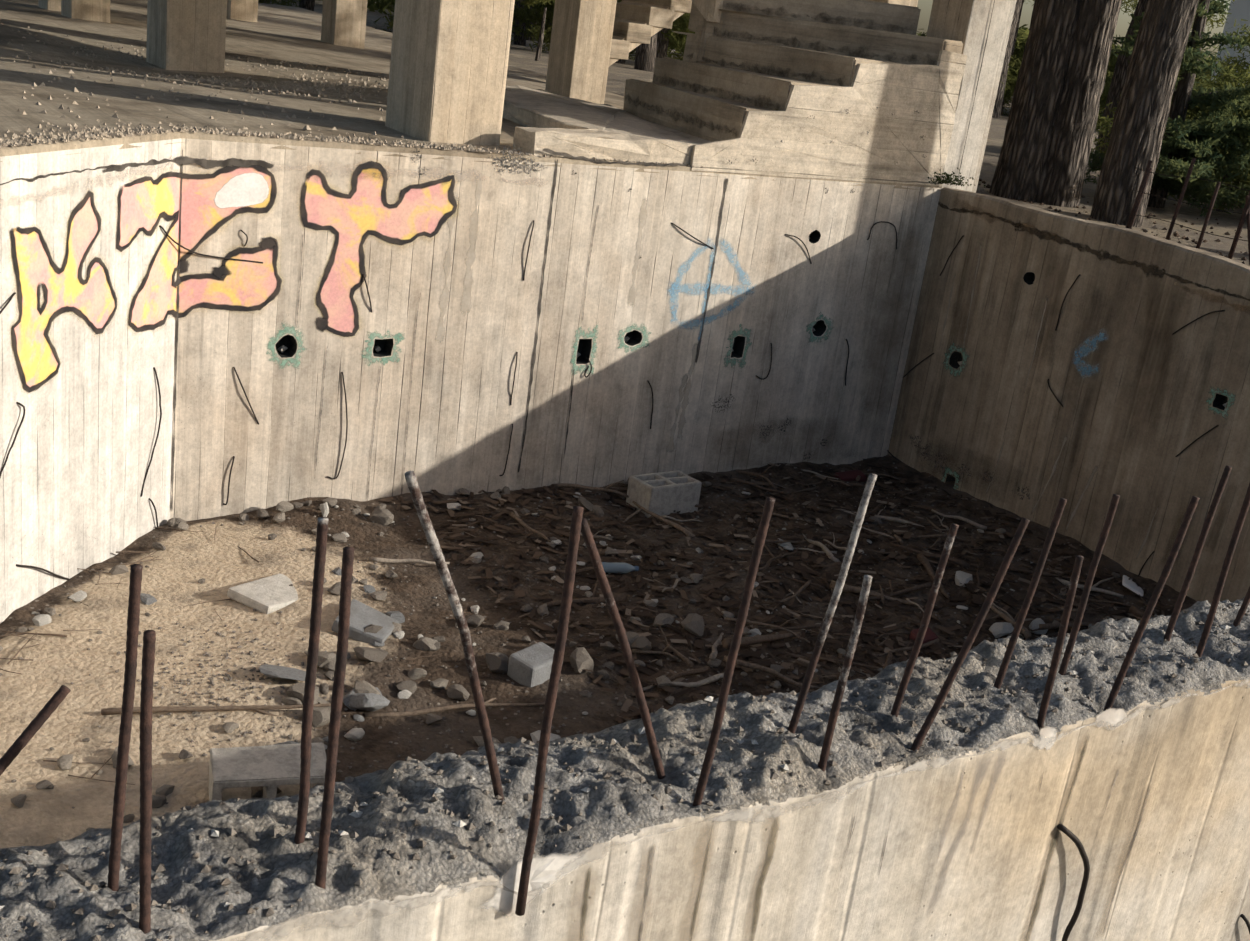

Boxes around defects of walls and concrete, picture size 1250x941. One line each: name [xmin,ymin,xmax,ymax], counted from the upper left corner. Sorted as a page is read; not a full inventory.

crack [958,0,995,176]
crack [0,149,273,511]
crack [938,201,1250,301]
spalling [0,685,71,776]
spalling [107,564,156,934]
spalling [294,517,355,889]
spalling [405,470,504,801]
spalling [487,506,666,916]
spalling [788,473,877,734]
spalling [818,575,873,772]
spalling [1037,494,1120,750]
spalling [1096,465,1232,728]